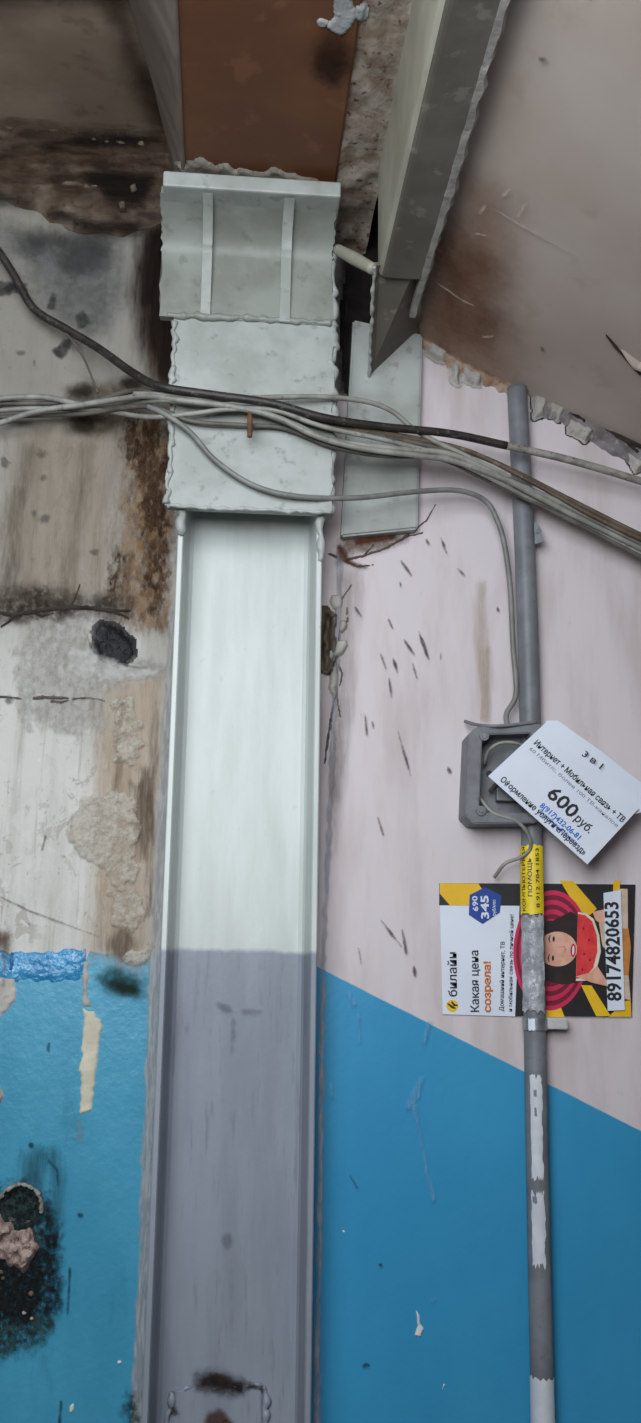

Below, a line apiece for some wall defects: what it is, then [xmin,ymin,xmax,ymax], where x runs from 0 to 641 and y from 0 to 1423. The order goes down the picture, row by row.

peeling [317,0,369,35]
water stain [53,134,156,146]
spalling [418,333,513,394]
spalling [530,396,641,474]
corrosion [68,378,173,632]
peeling [111,694,144,765]
peeling [67,791,146,932]
peeling [123,941,153,964]
peeling [0,977,17,1018]
peeling [79,962,102,1114]
spalling [0,1214,40,1280]
corrosion [196,1372,263,1423]